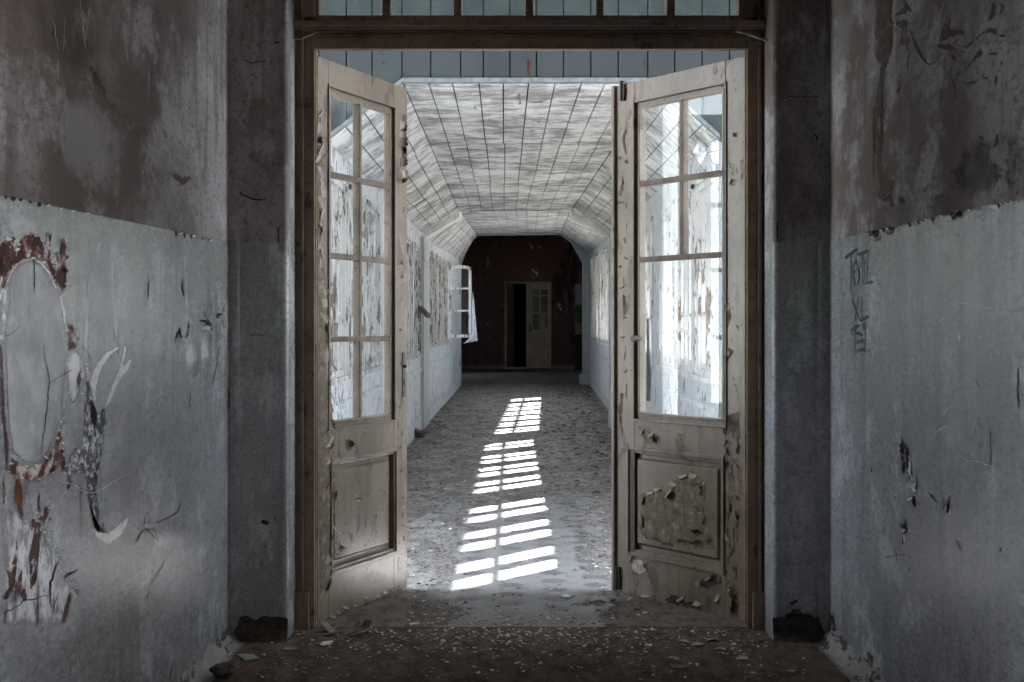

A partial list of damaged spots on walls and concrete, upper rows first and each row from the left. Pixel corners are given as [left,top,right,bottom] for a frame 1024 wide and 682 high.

damp [959,141,1015,189]
spalling [868,200,1019,241]
peeling [0,232,69,297]
peeling [64,323,92,405]
peeling [0,345,69,480]
peeling [894,439,917,507]
peeling [3,505,78,625]